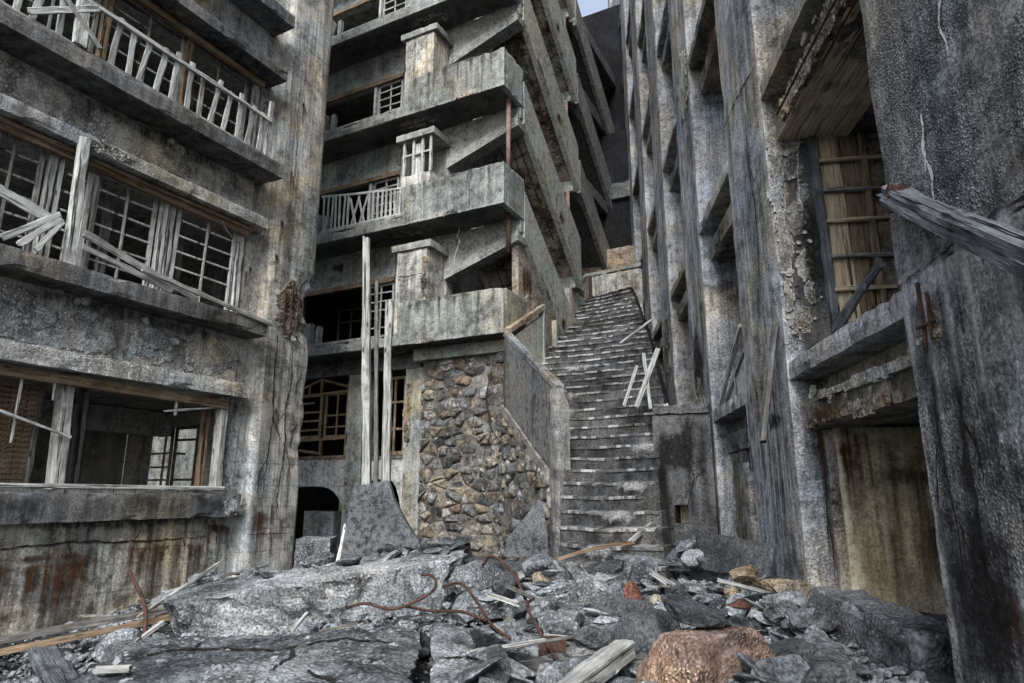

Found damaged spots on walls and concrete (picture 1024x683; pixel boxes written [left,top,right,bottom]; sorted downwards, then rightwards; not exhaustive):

flaking render [763,0,855,352]
corrosion [22,553,97,615]
corrosion [128,524,229,576]
crack [249,335,293,551]